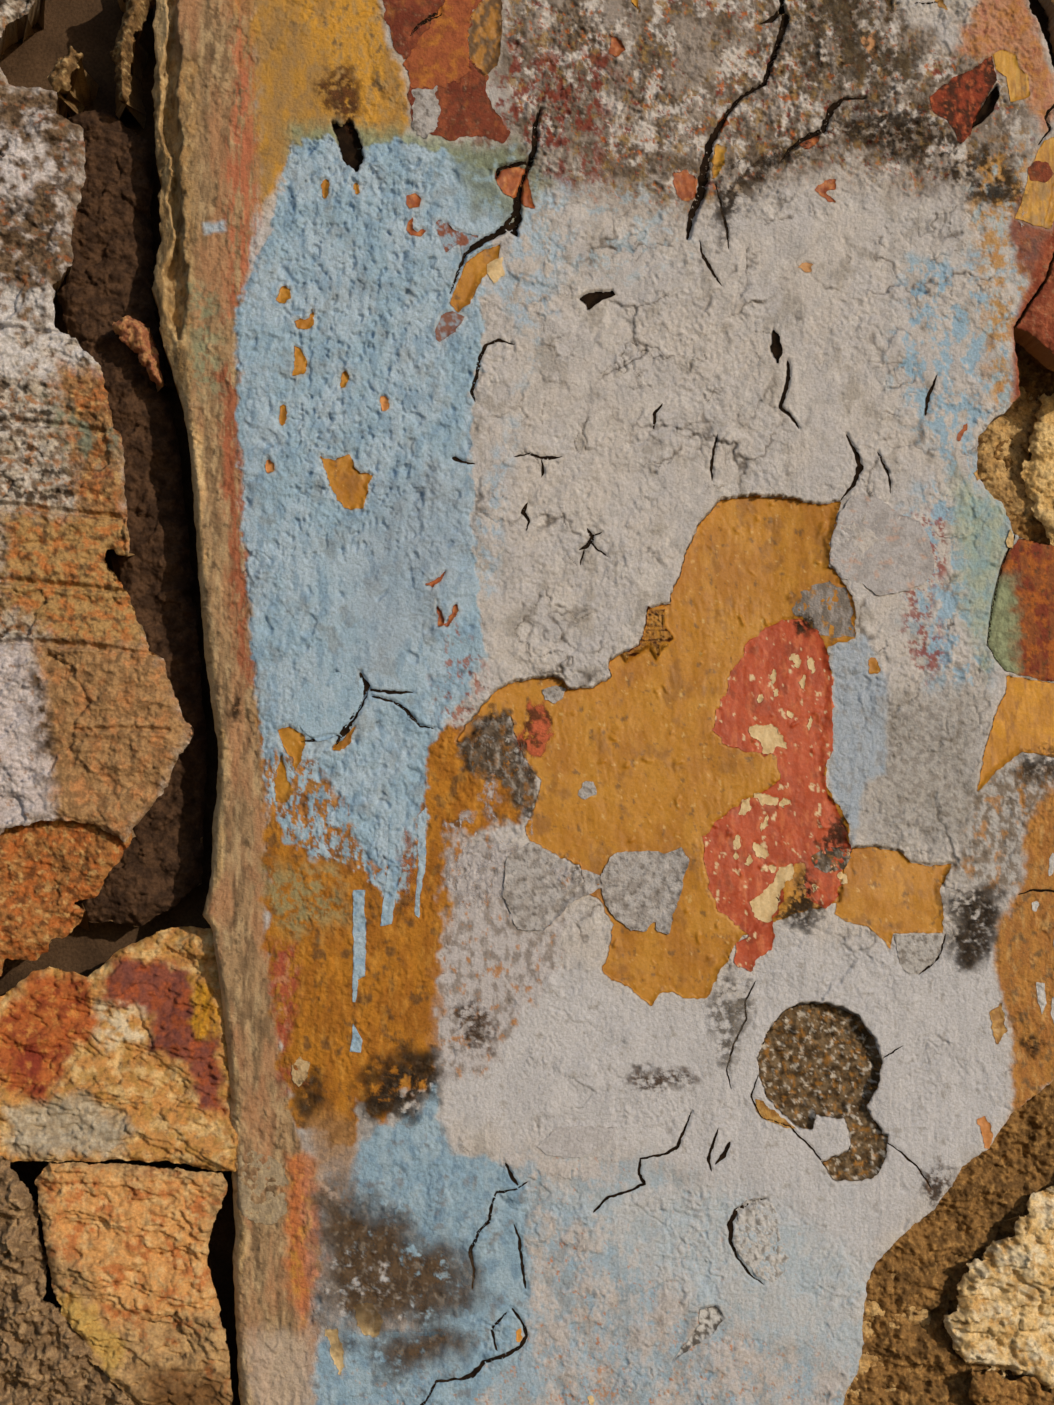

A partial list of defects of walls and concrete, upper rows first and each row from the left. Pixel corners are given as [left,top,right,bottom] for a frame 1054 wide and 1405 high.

spalling [333,121,363,194]
peeling [383,0,511,143]
crack [686,0,789,286]
crack [781,97,865,160]
peeling [406,193,505,342]
peeling [320,454,373,510]
peeling [274,726,306,803]
crack [301,672,434,748]
peeling [457,495,952,1006]
peeling [977,529,1054,791]
spalling [755,1003,888,1181]
crack [420,1163,528,1405]